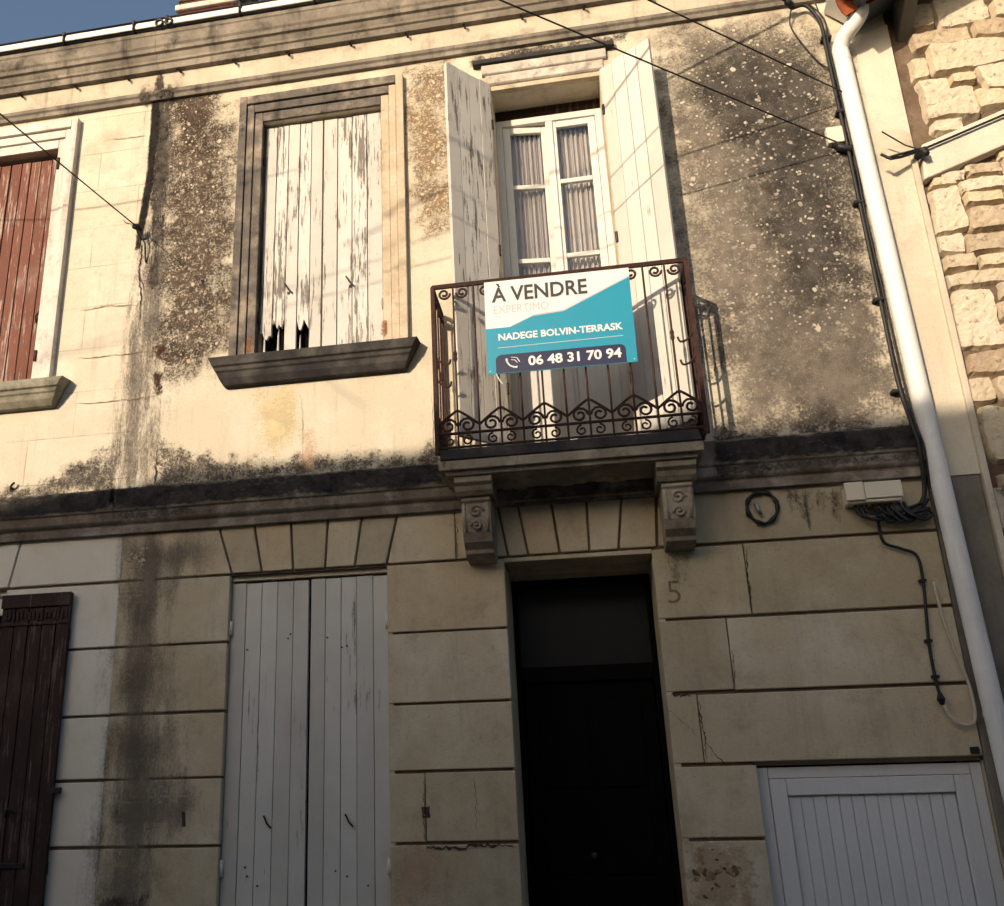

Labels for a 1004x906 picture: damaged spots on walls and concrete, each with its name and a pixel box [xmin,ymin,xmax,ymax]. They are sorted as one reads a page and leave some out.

damp [0,74,446,520]
damp [714,398,922,477]
crack [745,548,753,611]
damp [100,533,198,906]
crack [666,705,724,765]
spalling [692,847,740,899]